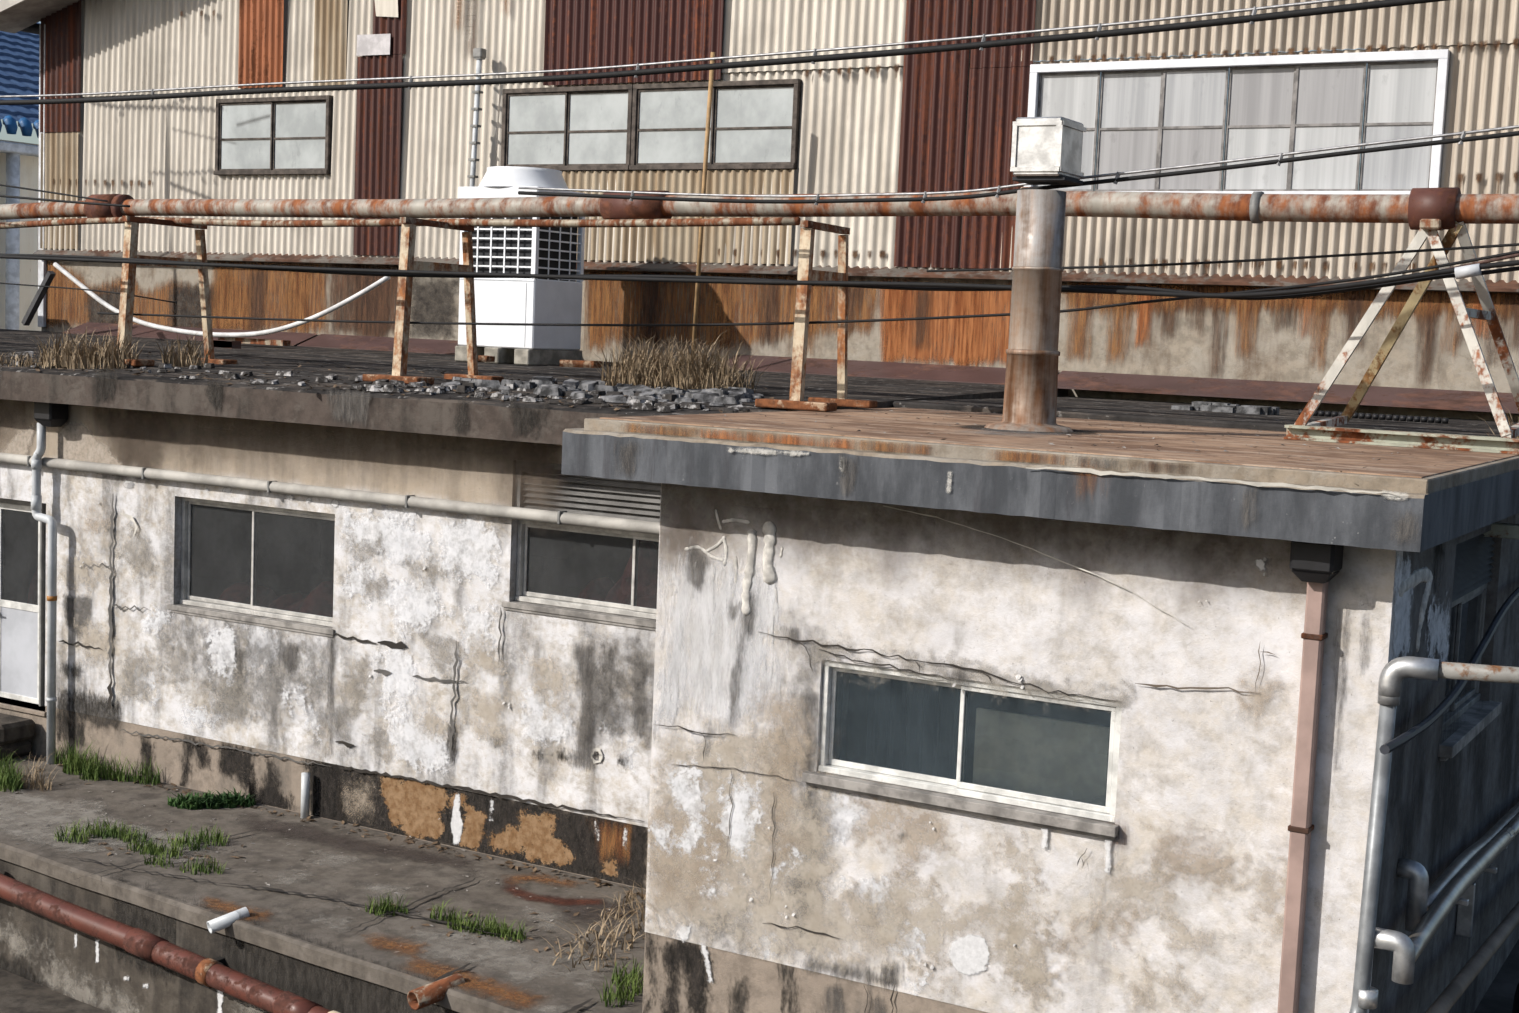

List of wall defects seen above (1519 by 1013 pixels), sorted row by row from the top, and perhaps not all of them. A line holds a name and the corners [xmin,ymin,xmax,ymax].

corrosion [1067,258,1519,379]
water stain [59,595,102,650]
water stain [57,663,121,746]
crack [79,495,644,822]
water stain [172,625,648,889]
peeling [340,505,577,867]
water stain [575,546,824,829]
crack [760,632,1277,715]
spalling [600,823,630,876]
crack [659,725,840,939]
water stain [643,933,709,1013]
water stain [778,959,898,1013]